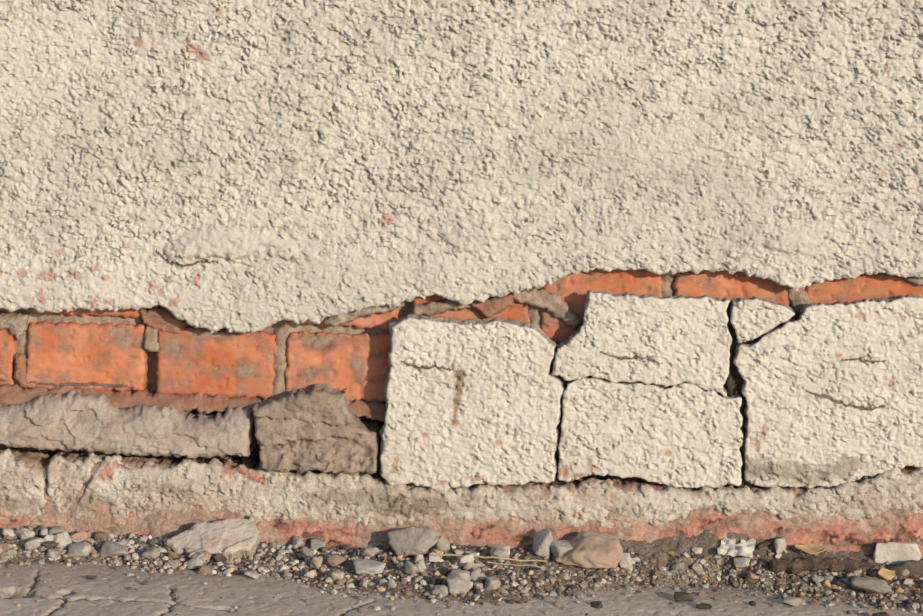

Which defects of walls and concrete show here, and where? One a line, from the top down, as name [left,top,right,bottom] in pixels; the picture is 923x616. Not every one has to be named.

spalling [0,308,30,340]
spalling [138,305,234,361]
spalling [304,284,582,349]
spalling [773,281,811,315]
spalling [882,272,923,287]
crack [600,351,665,387]
corrosion [454,371,466,417]
crack [716,301,801,490]
crack [550,346,592,486]
peeling [270,518,357,548]
peeling [661,512,741,539]
peeling [752,518,923,555]